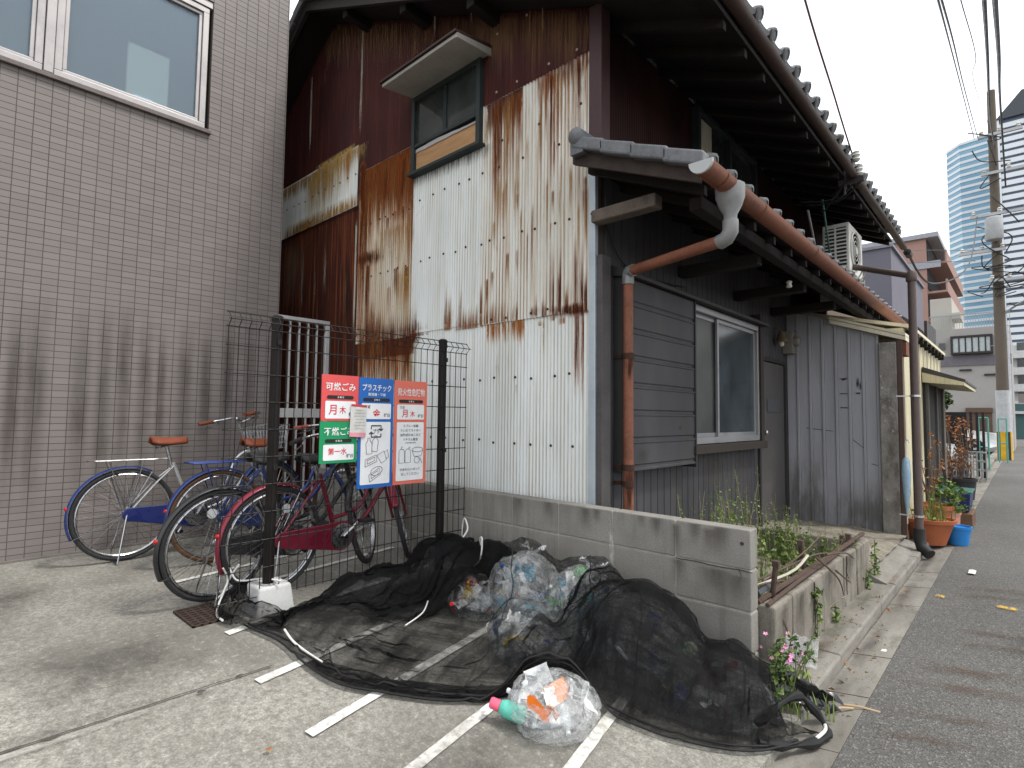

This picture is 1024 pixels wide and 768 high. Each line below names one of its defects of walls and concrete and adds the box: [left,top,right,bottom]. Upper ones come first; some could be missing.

corrosion [486,88,523,211]
corrosion [538,53,588,227]
corrosion [283,144,423,378]
corrosion [444,261,587,382]